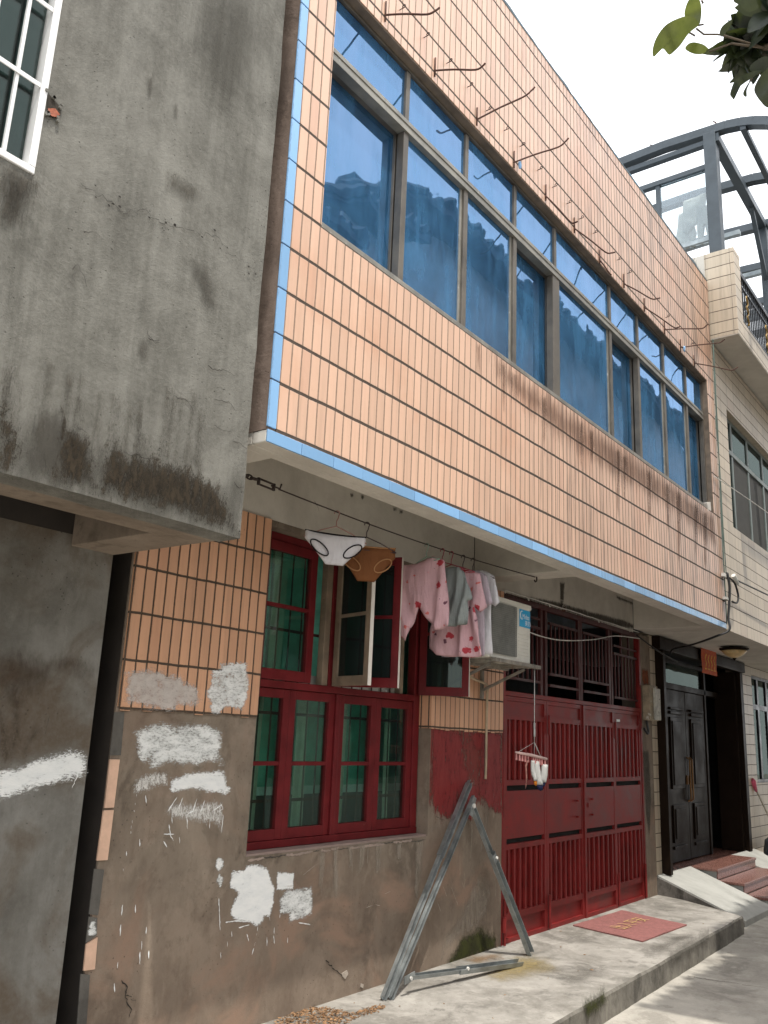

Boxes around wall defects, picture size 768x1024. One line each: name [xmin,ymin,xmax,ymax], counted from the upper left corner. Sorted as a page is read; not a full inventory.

crack [80,182,263,276]
damp [0,403,22,471]
damp [34,408,240,537]
damp [509,375,715,540]
peeling [429,729,502,824]